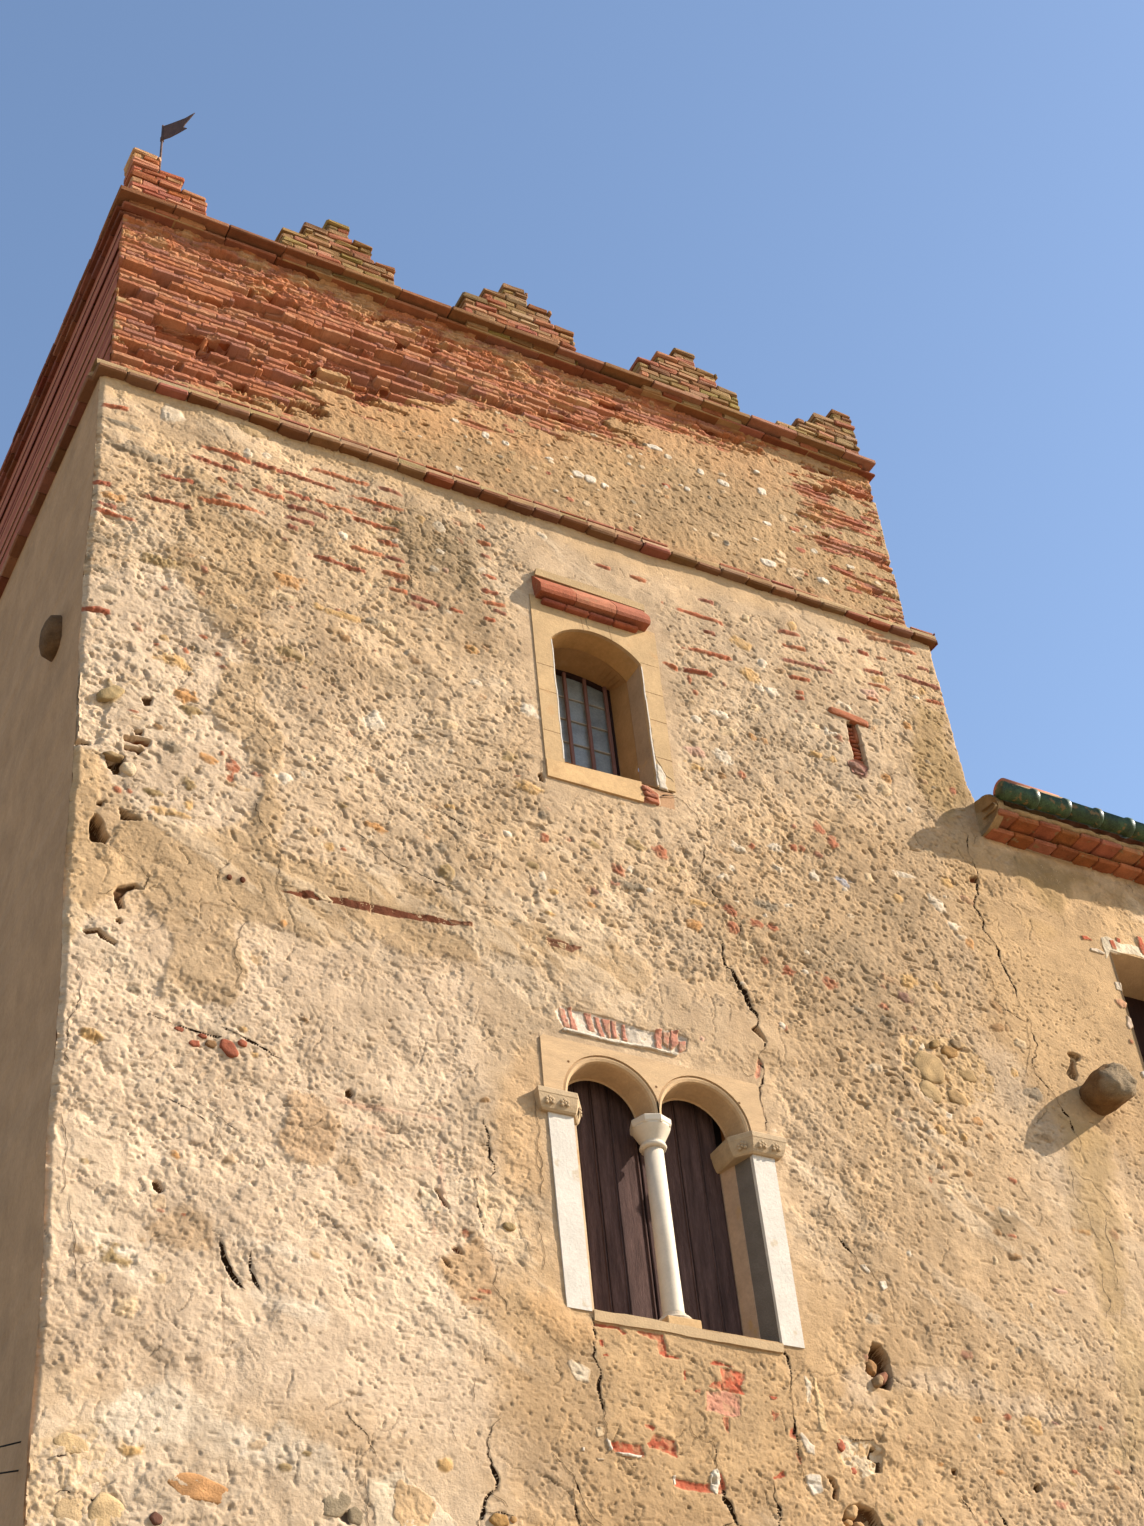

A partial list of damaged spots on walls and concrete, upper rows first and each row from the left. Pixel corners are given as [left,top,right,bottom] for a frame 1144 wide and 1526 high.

spalling [150,322,230,356]
spalling [345,380,410,398]
spalling [82,802,149,946]
crack [641,670,767,1131]
crack [883,662,1144,1526]
crack [592,1317,608,1439]
spalling [865,1345,889,1390]
crack [552,1452,603,1526]
crack [690,1419,741,1526]
crack [775,1352,807,1526]
spalling [827,1478,884,1526]
spalling [837,1434,883,1479]